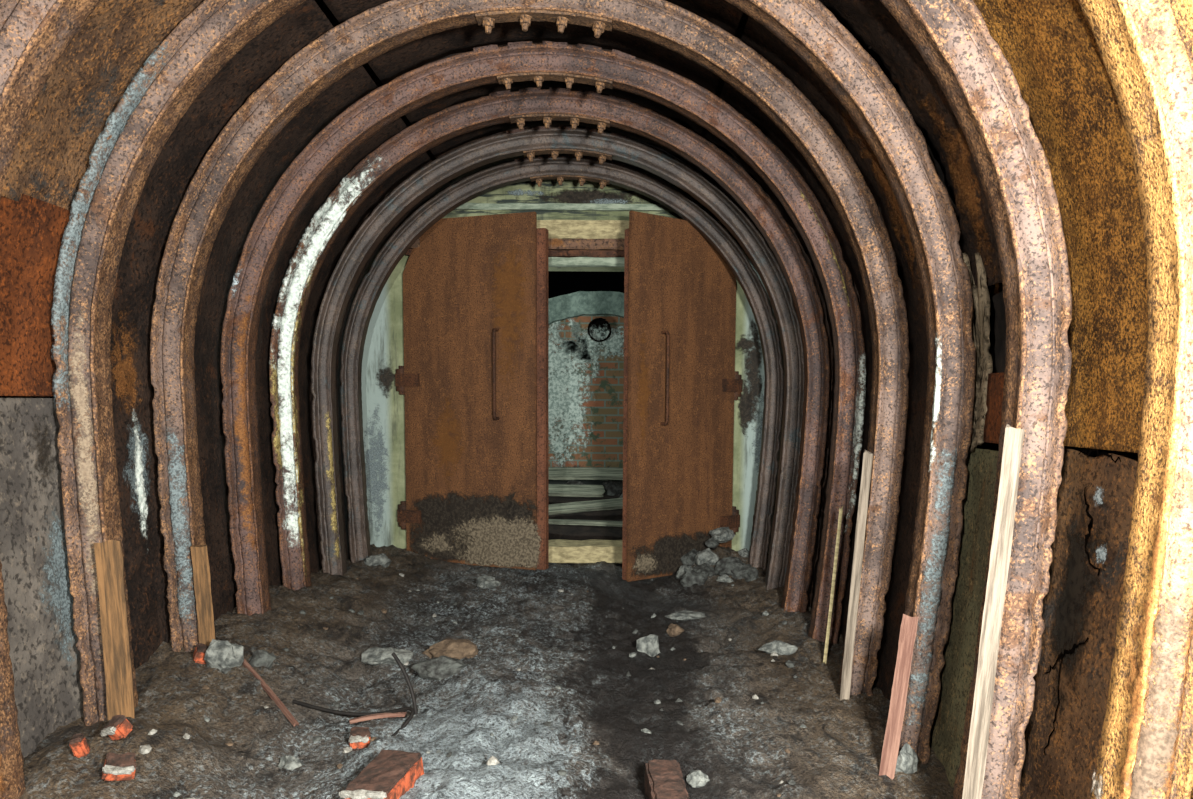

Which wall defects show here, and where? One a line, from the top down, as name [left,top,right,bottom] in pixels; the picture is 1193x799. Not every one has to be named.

leakage [270,170,371,570]
leakage [365,367,395,536]
leakage [735,321,764,472]